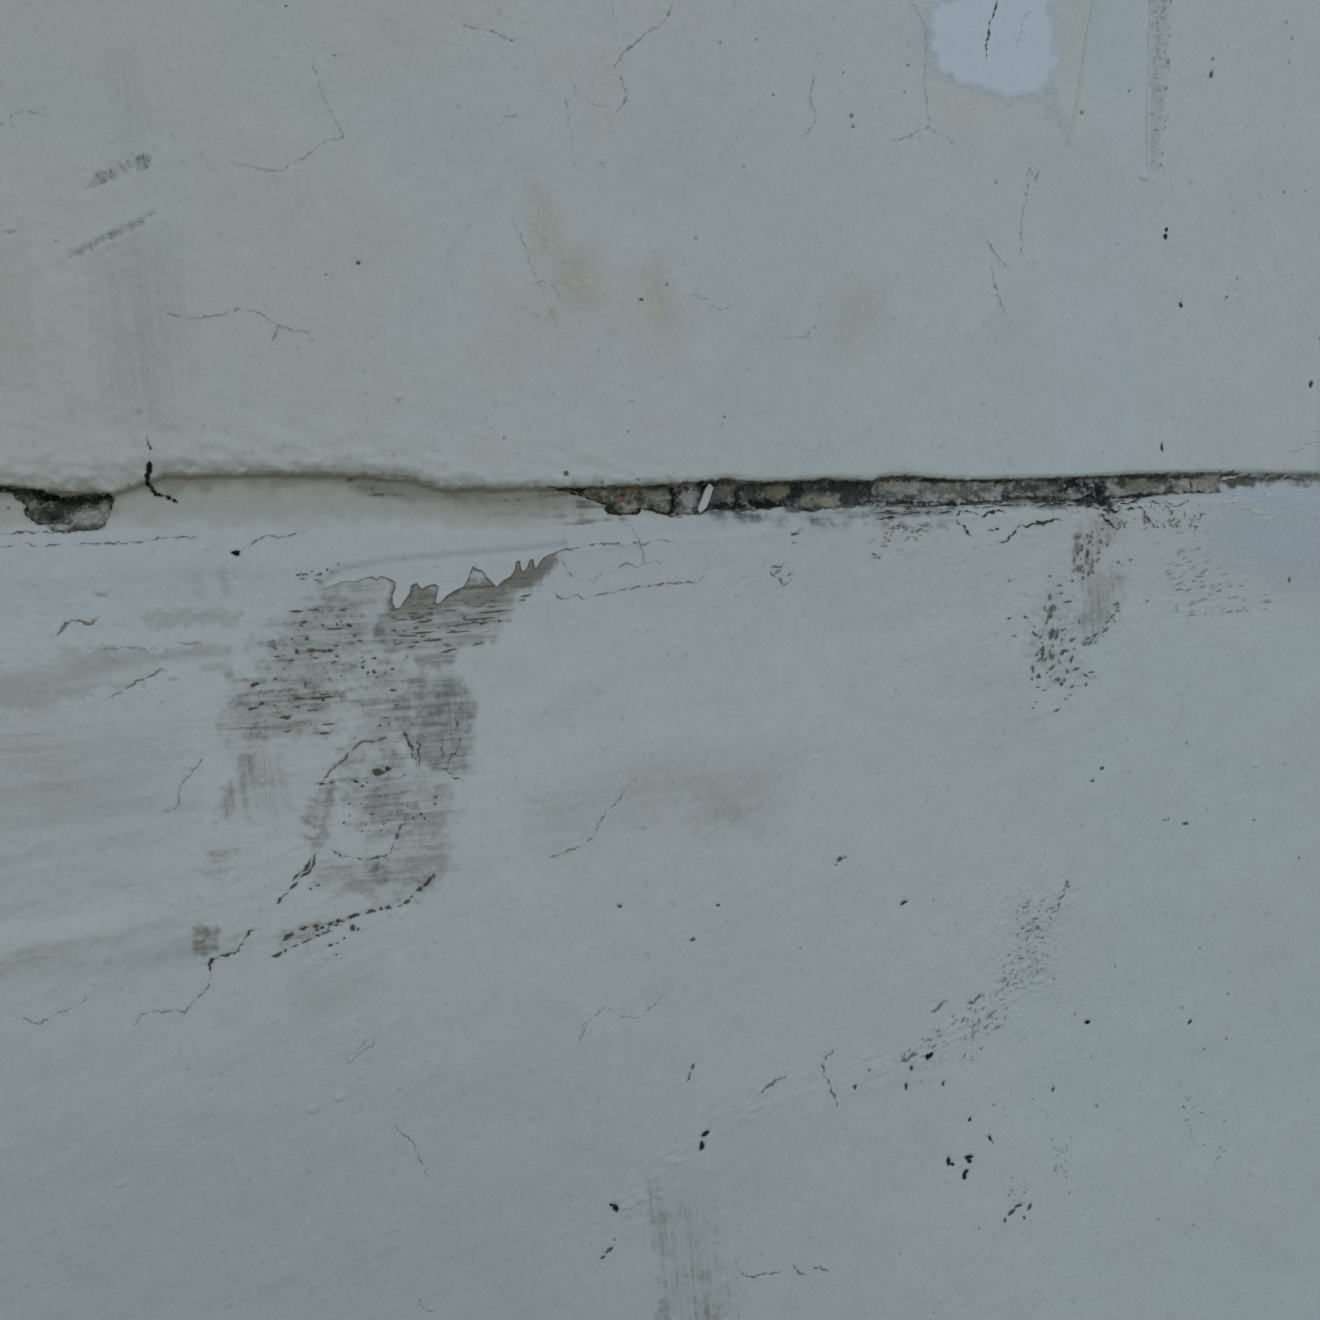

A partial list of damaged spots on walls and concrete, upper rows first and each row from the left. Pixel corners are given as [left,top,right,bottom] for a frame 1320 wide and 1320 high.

crack [145,435,178,503]
spalling [0,486,115,532]
crack [875,474,1305,543]
crack [7,528,197,547]
water stain [391,558,554,611]